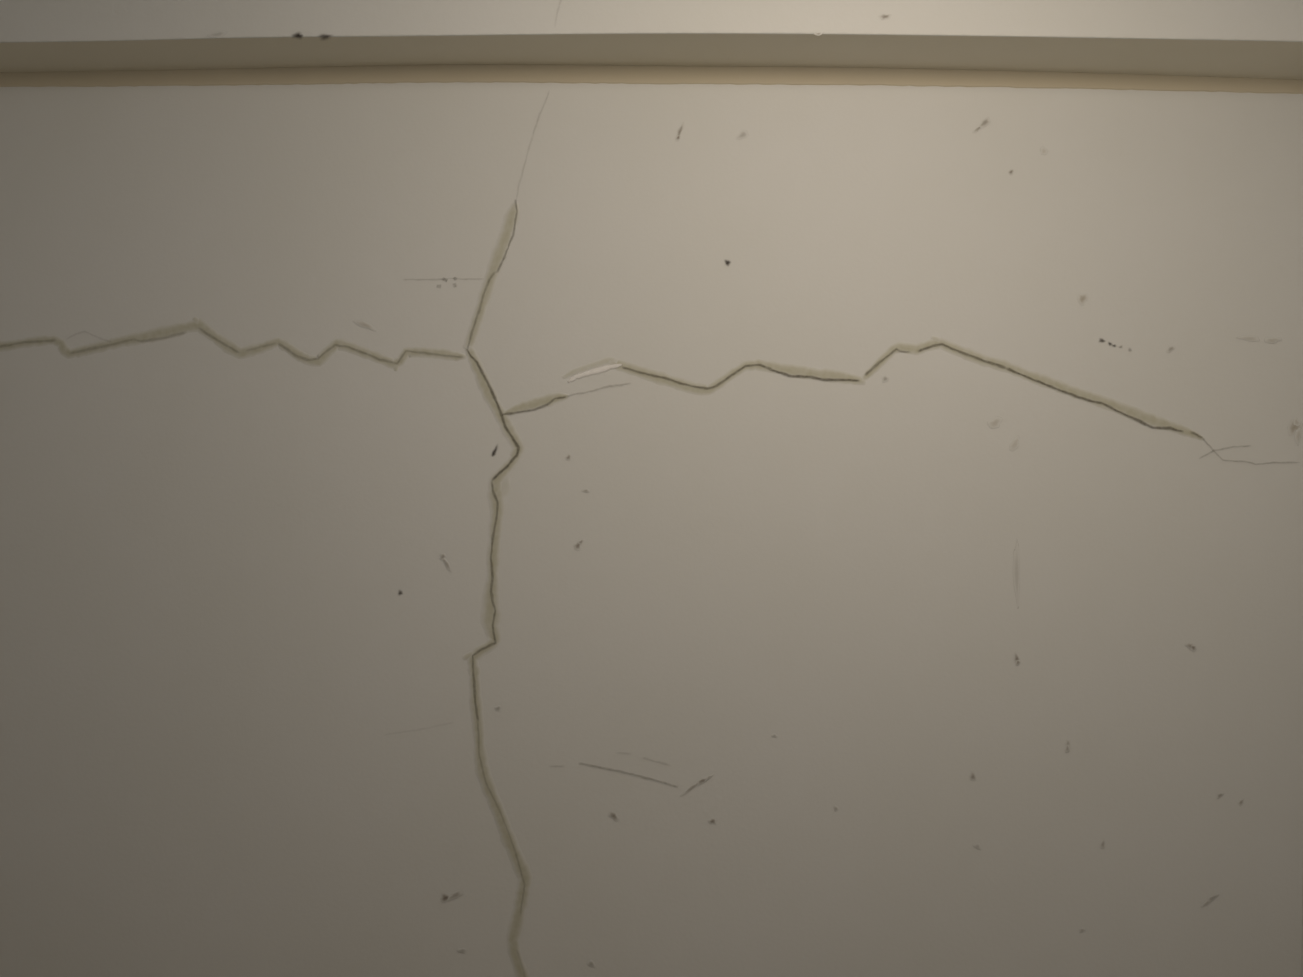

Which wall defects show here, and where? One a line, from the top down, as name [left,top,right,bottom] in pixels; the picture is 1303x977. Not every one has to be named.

crack [0,202,1205,977]